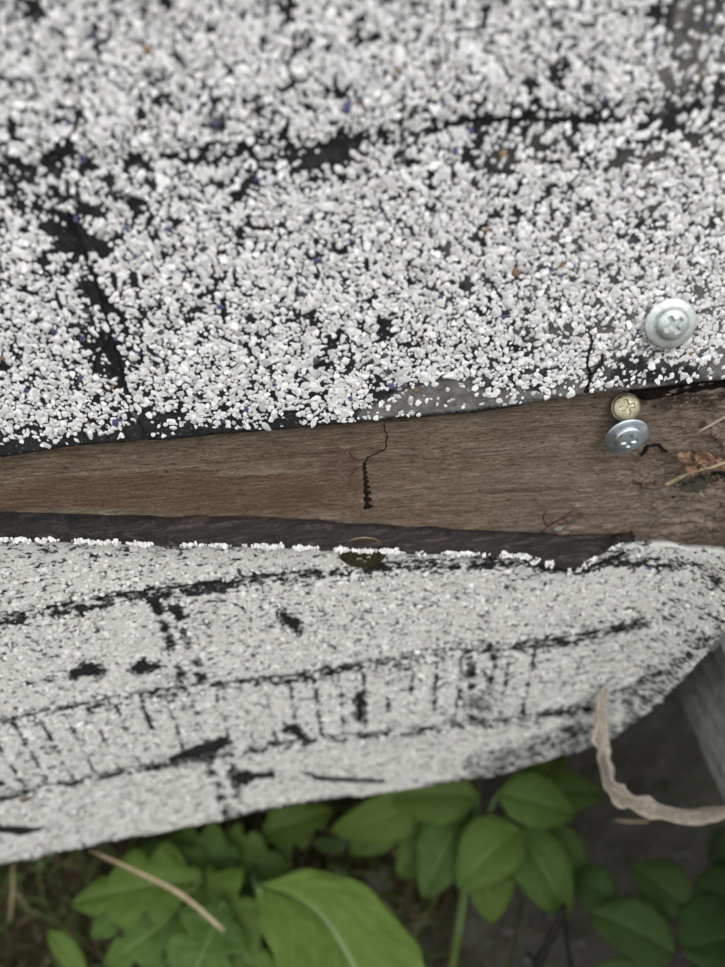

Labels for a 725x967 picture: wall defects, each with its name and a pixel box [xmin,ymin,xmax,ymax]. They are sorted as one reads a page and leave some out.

peeling [605,339,725,453]
crack [348,421,388,509]
peeling [634,443,725,532]